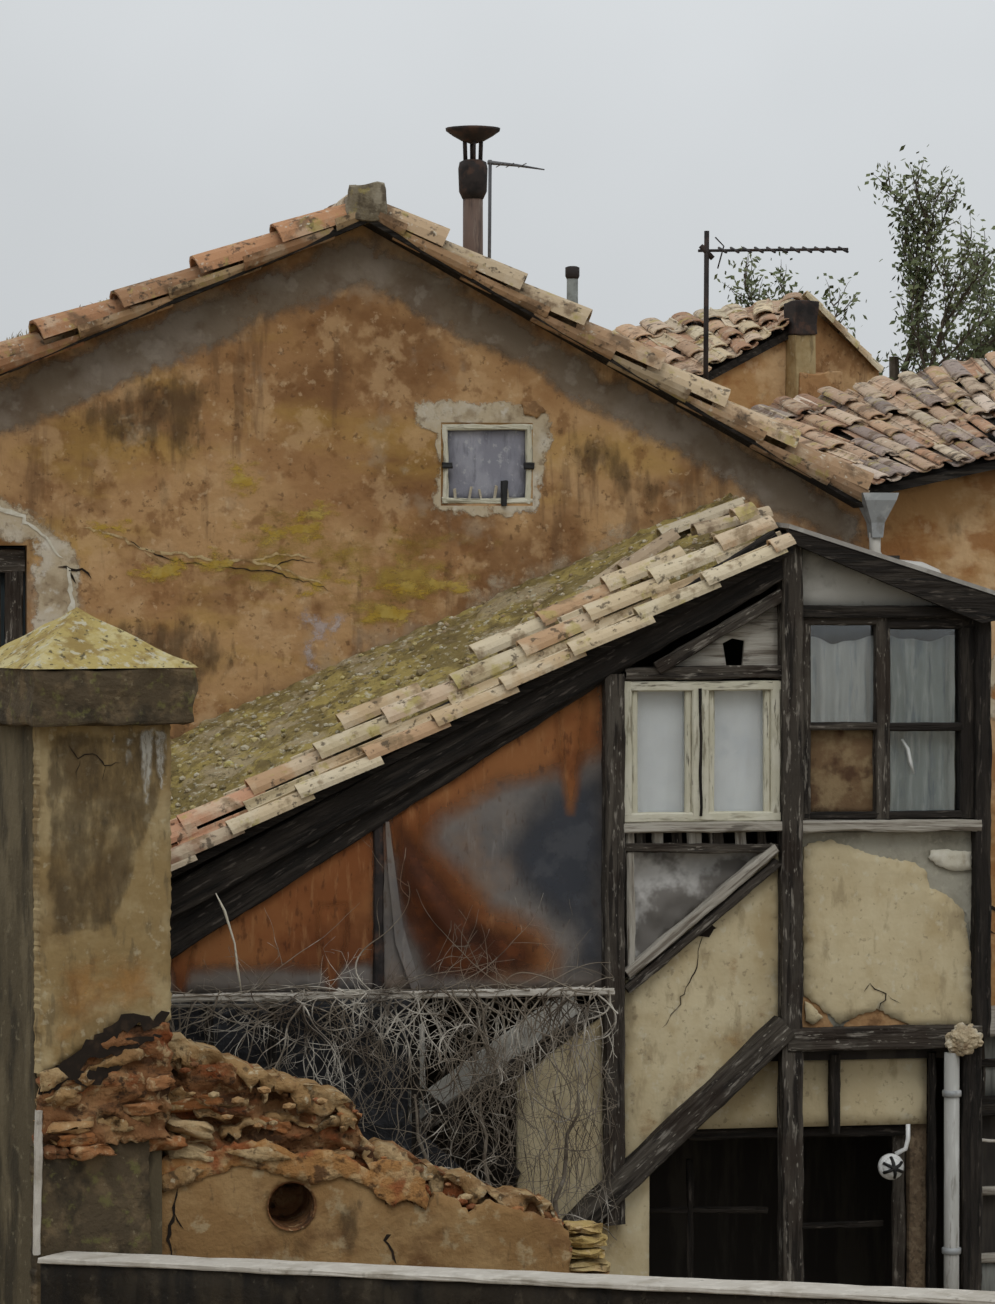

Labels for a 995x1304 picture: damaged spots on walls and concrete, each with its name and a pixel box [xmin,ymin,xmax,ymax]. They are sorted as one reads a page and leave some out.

flaking render [414,399,553,517]
crack [60,566,92,583]
crack [85,527,328,591]
corrosion [387,686,602,972]
corrosion [171,831,374,991]
flaking render [803,831,972,934]
crack [662,936,703,1028]
flaking render [802,997,909,1027]
flaking render [35,1048,153,1111]
flaking render [97,1115,151,1132]
flaking render [162,1138,429,1211]